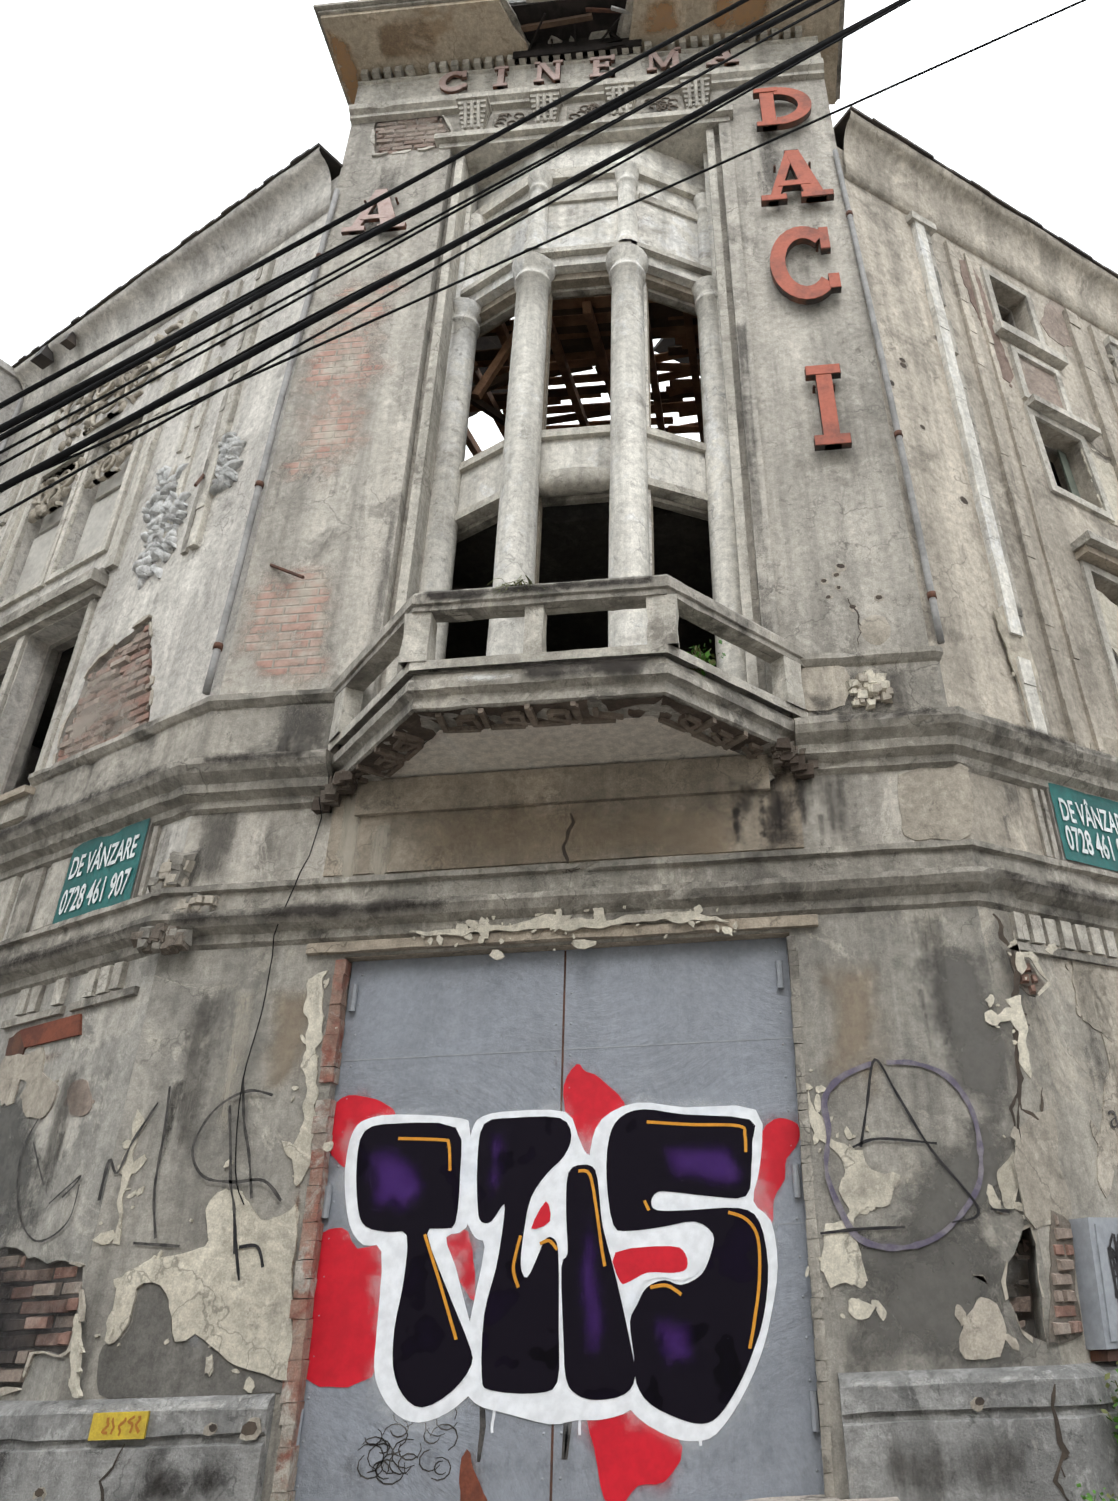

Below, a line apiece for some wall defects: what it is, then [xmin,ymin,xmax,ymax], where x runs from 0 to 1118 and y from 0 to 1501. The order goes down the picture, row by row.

spalling [52,614,155,764]
crack [562,813,580,873]
flaking render [409,904,738,960]
flaking render [0,1047,95,1131]
flaking render [282,971,338,1186]
flaking render [984,938,1118,1198]
flaking render [92,1110,147,1245]
flaking render [0,1189,300,1412]
flaking render [805,1069,908,1321]
flaking render [955,1108,1083,1360]
crack [99,1444,125,1501]
crack [1051,1384,1070,1501]